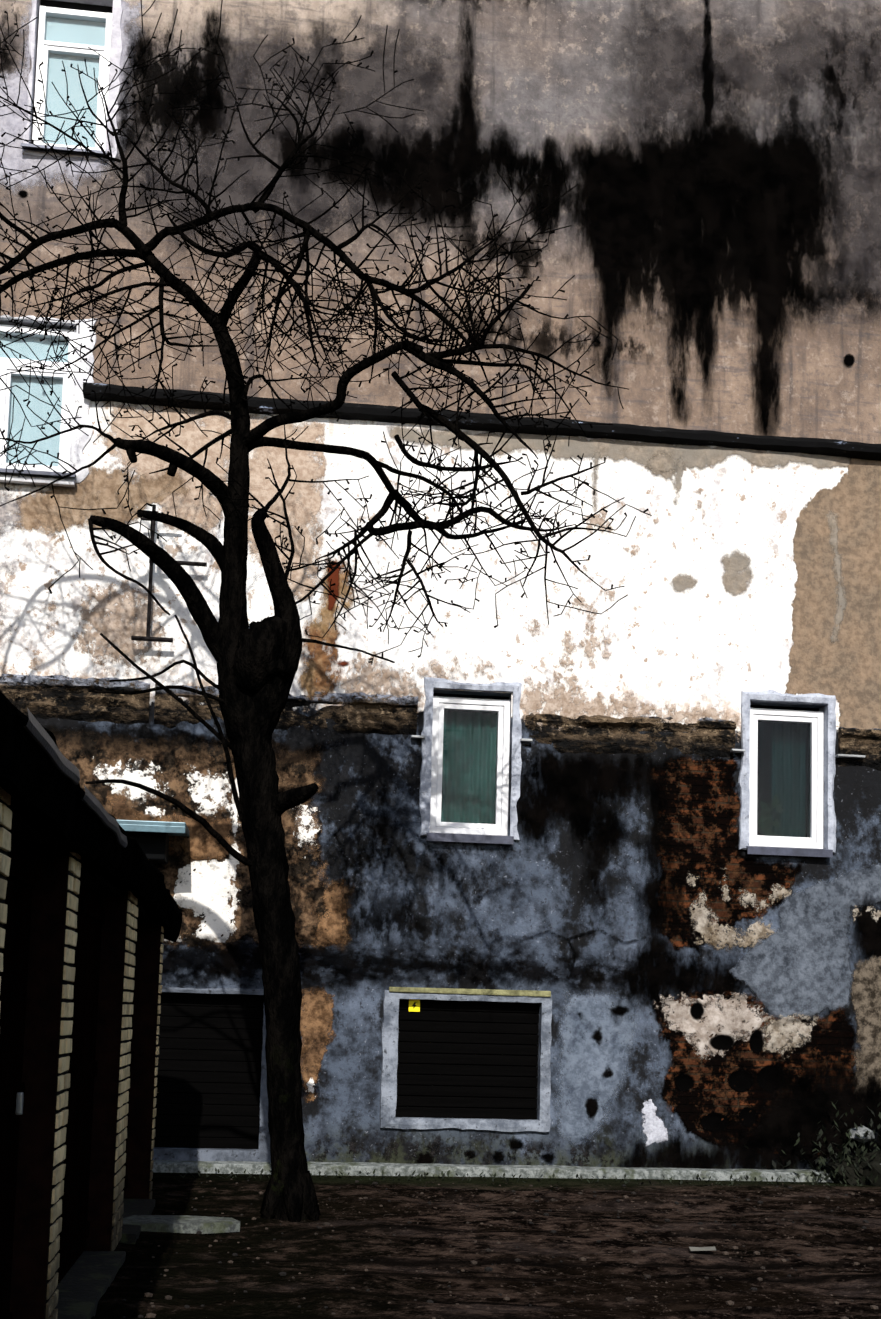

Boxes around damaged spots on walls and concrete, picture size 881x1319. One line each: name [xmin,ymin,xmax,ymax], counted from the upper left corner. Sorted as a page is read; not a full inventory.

leakage [119,13,231,149]
leakage [279,0,878,510]
peeling [0,404,231,536]
peeling [248,417,326,601]
peeling [784,458,881,729]
flaking render [46,723,259,949]
leakage [161,935,262,988]
leakage [297,750,744,1017]
leakage [309,1059,881,1171]
flaking render [653,756,802,952]
flaking render [642,956,881,1147]
leakage [853,899,881,963]